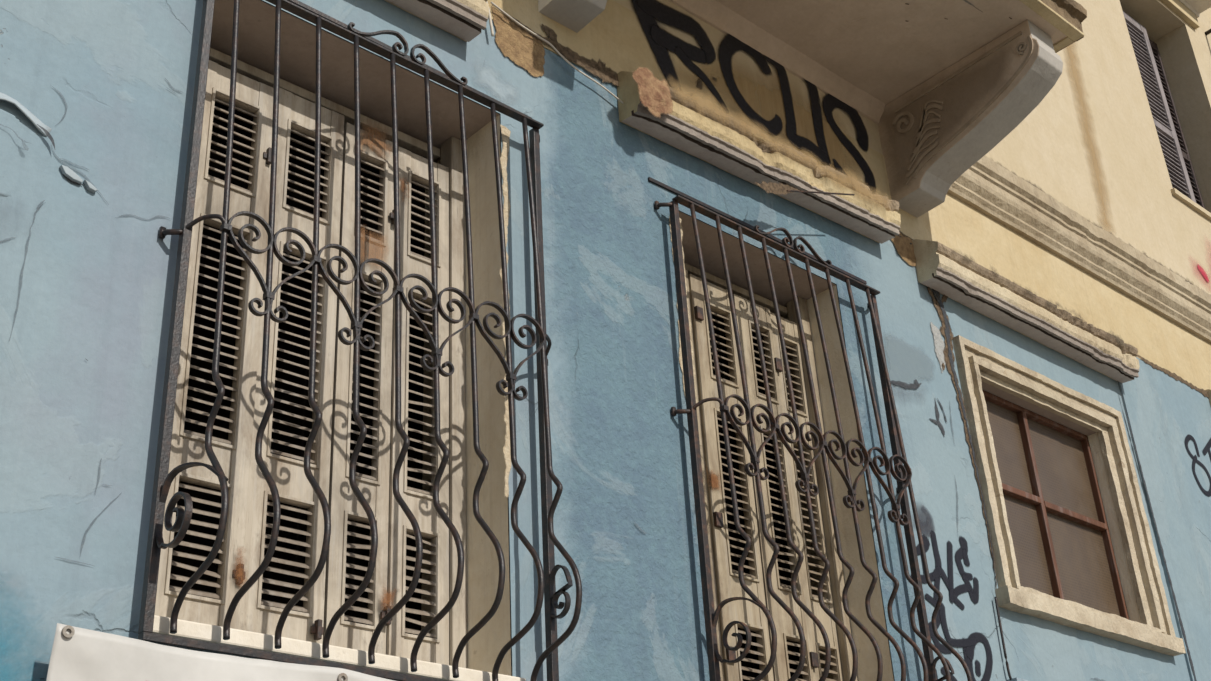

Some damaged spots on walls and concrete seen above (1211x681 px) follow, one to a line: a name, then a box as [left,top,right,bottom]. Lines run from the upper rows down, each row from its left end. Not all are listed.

peeling [491,7,545,77]
peeling [478,67,515,102]
spalling [633,67,673,117]
crack [0,87,164,220]
crack [0,200,45,341]